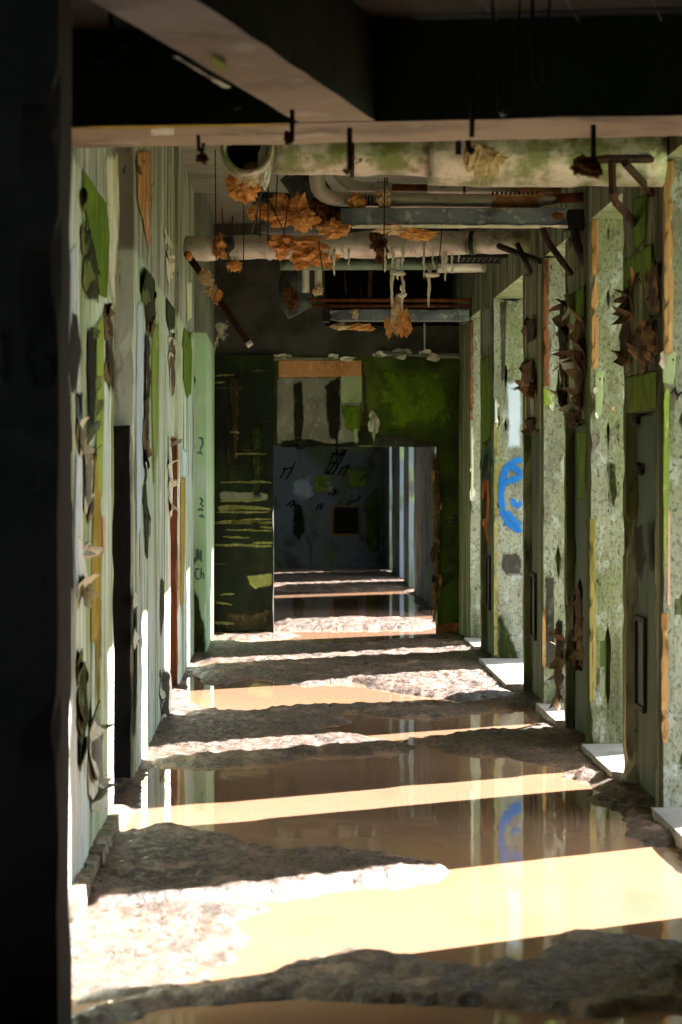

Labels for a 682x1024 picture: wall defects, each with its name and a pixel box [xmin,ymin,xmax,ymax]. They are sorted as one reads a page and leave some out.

rust [551,192,583,220]
flaking render [81,187,115,393]
flaking render [511,294,586,431]
flaking render [609,262,676,384]
peeling [77,415,102,524]
leakage [282,377,442,622]
flaking render [521,417,537,436]
peeling [78,536,107,608]
flaking render [547,579,585,713]